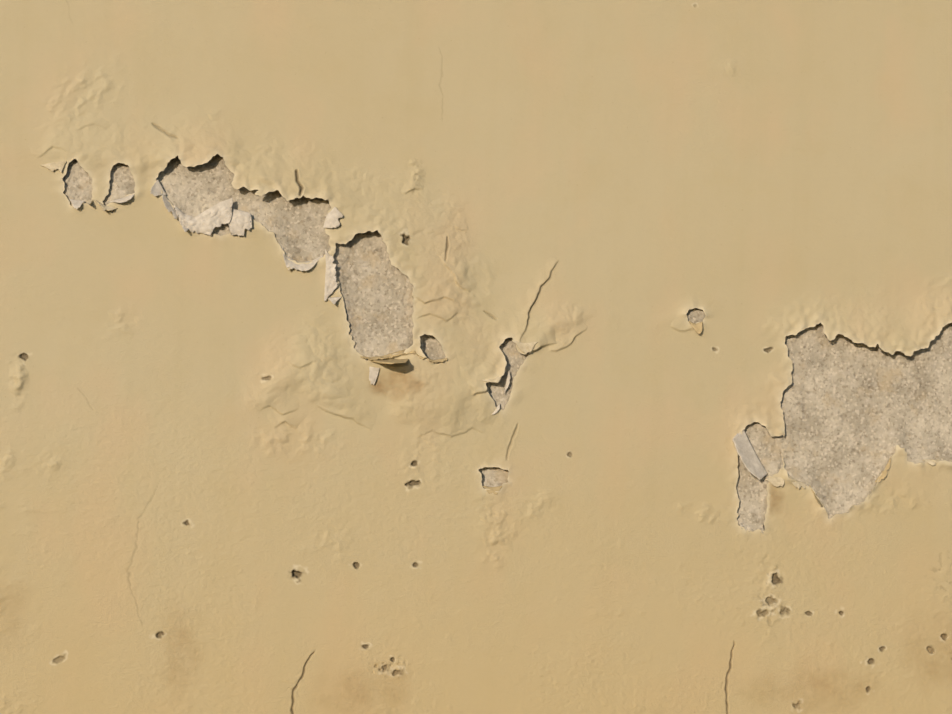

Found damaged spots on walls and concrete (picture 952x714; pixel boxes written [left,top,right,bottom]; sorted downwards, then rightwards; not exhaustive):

peeling [41,148,453,385]
crack [482,257,566,343]
peeling [680,301,710,334]
peeling [477,332,538,419]
peeling [730,315,952,538]
peeling [475,461,517,497]
crack [282,648,320,714]
crack [718,639,739,714]